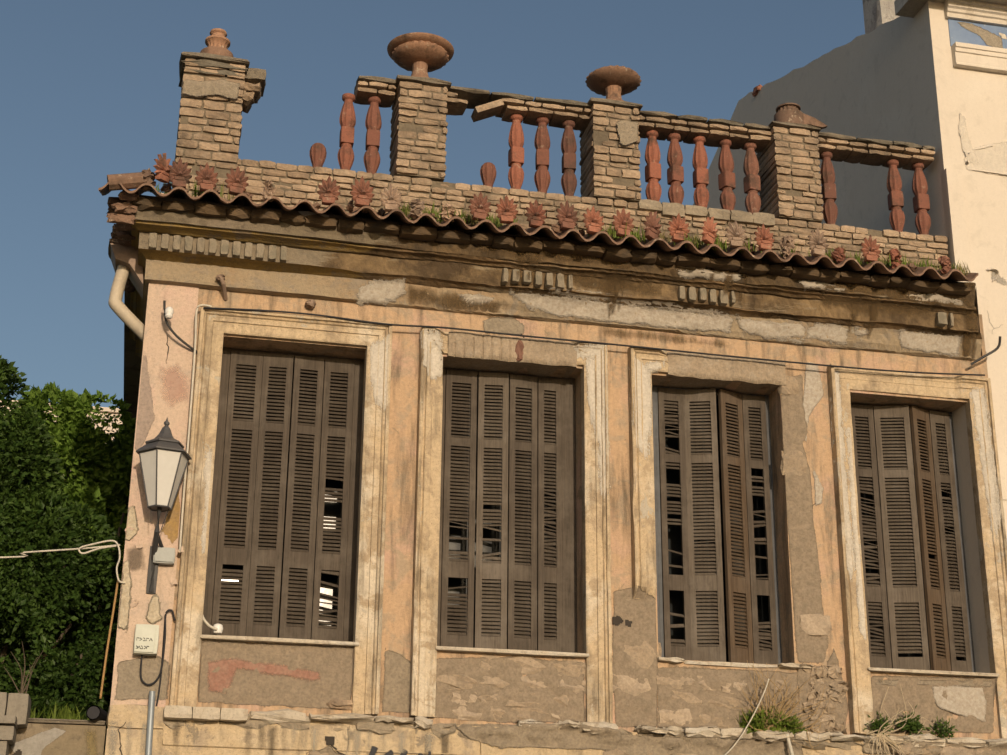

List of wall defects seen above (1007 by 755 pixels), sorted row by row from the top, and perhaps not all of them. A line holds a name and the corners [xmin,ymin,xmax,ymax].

peeling [958,22,1007,48]
peeling [356,277,406,306]
peeling [457,294,494,306]
peeling [508,287,869,345]
flaking render [629,351,866,734]
peeling [198,639,355,710]
flaking render [453,586,662,750]
peeling [871,674,998,734]